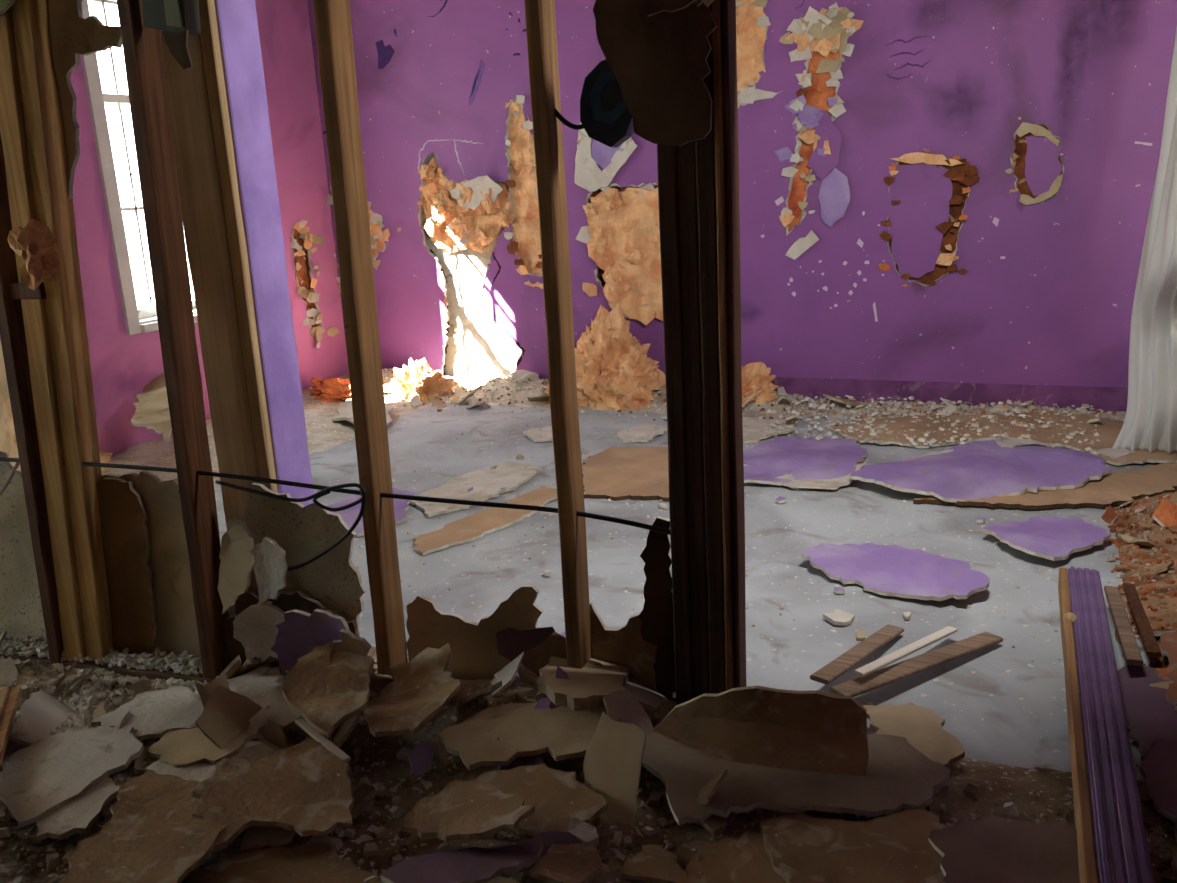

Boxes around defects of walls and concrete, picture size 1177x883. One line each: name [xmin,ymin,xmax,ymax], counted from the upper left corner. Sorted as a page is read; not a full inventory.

spalling [736,0,979,309]
spalling [1005,117,1064,205]
peeling [290,220,339,348]
spalling [368,201,401,270]
spalling [417,95,543,378]
spalling [576,183,663,325]